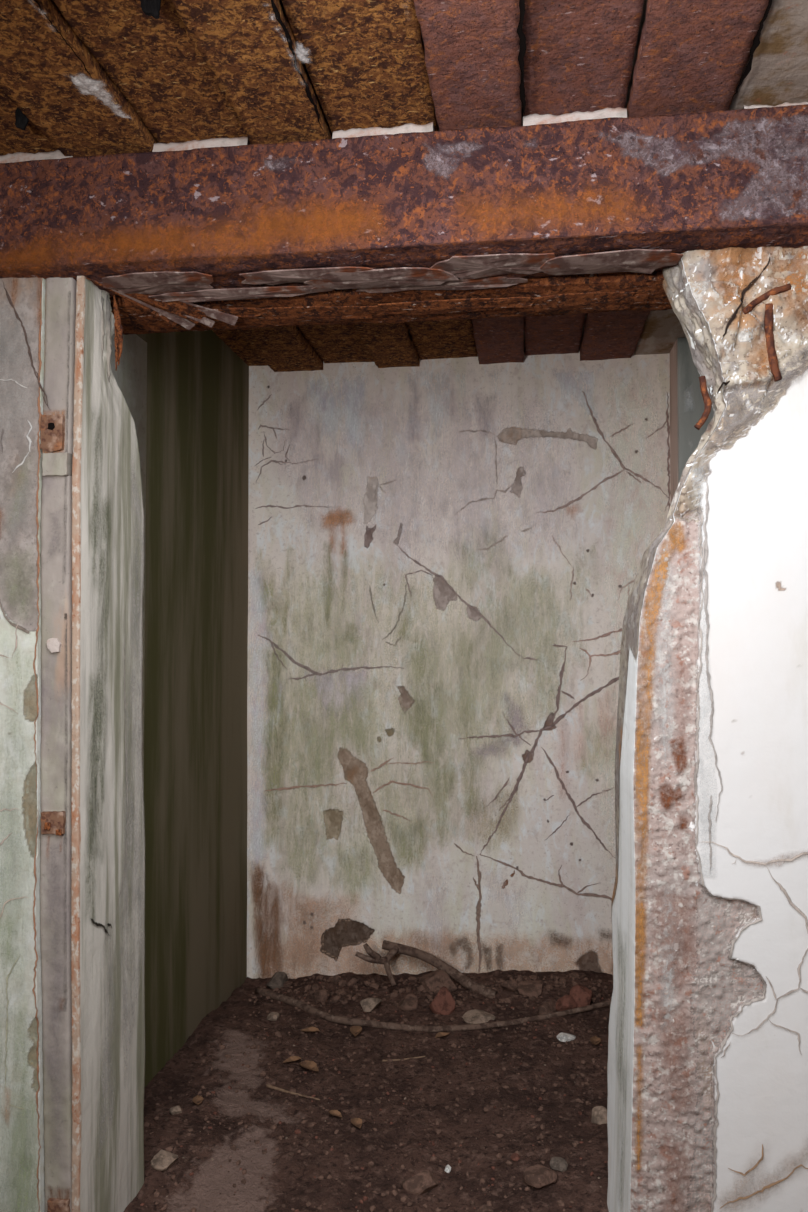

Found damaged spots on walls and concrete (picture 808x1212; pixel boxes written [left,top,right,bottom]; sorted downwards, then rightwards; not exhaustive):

spalling [0,277,42,634]
crack [3,282,50,410]
spalling [21,763,37,858]
corrosion [33,277,63,789]
corrosion [32,809,69,1210]
spalling [338,748,405,894]
damp [251,572,613,979]
corrosion [424,142,481,178]
crack [255,391,671,974]
corrosion [599,115,808,220]
spalling [611,246,808,1212]
crack [710,842,808,1058]